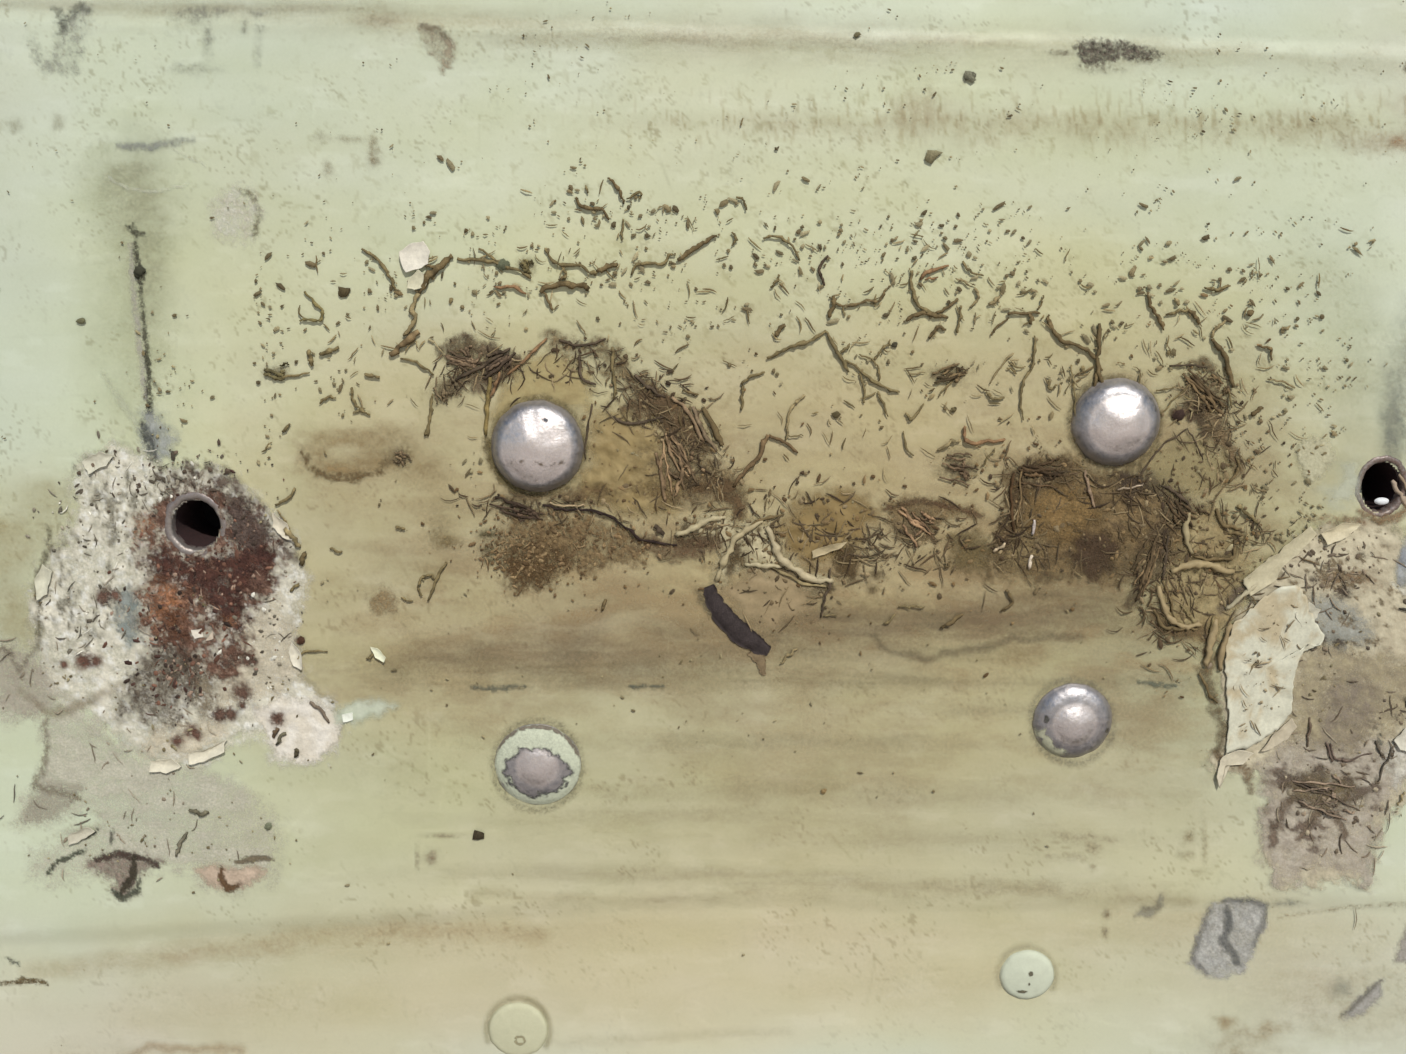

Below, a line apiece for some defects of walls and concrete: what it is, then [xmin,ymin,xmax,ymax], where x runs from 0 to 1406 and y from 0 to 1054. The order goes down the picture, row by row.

leakage [300,435,394,483]
peeling [1297,435,1335,481]
corrosion [60,641,107,669]
peeling [0,414,393,882]
corrosion [96,487,306,746]
leakage [517,551,863,675]
leakage [887,533,1141,636]
peeling [1200,515,1406,903]
peeling [1190,900,1267,978]
peeling [1396,932,1406,962]